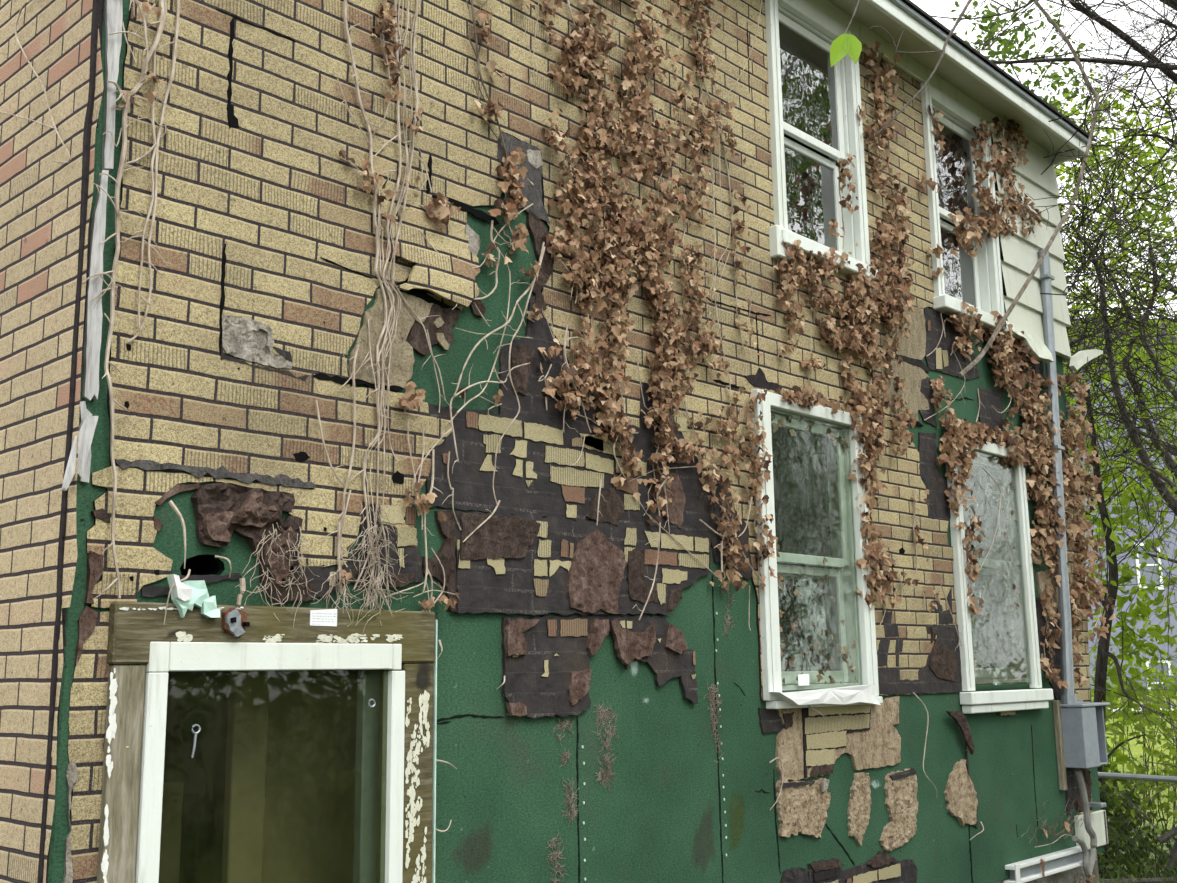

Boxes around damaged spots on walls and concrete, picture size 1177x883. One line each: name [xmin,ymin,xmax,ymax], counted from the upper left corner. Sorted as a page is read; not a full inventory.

peeling [880,304,949,427]
peeling [465,411,647,518]
peeling [533,521,574,596]
peeling [623,528,709,605]
peeling [217,607,245,637]
peeling [546,618,587,637]
peeling [106,668,129,778]
crack [437,713,504,724]
peeling [805,704,871,766]
peeling [405,690,430,883]
peeling [101,804,109,883]
peeling [824,863,901,883]